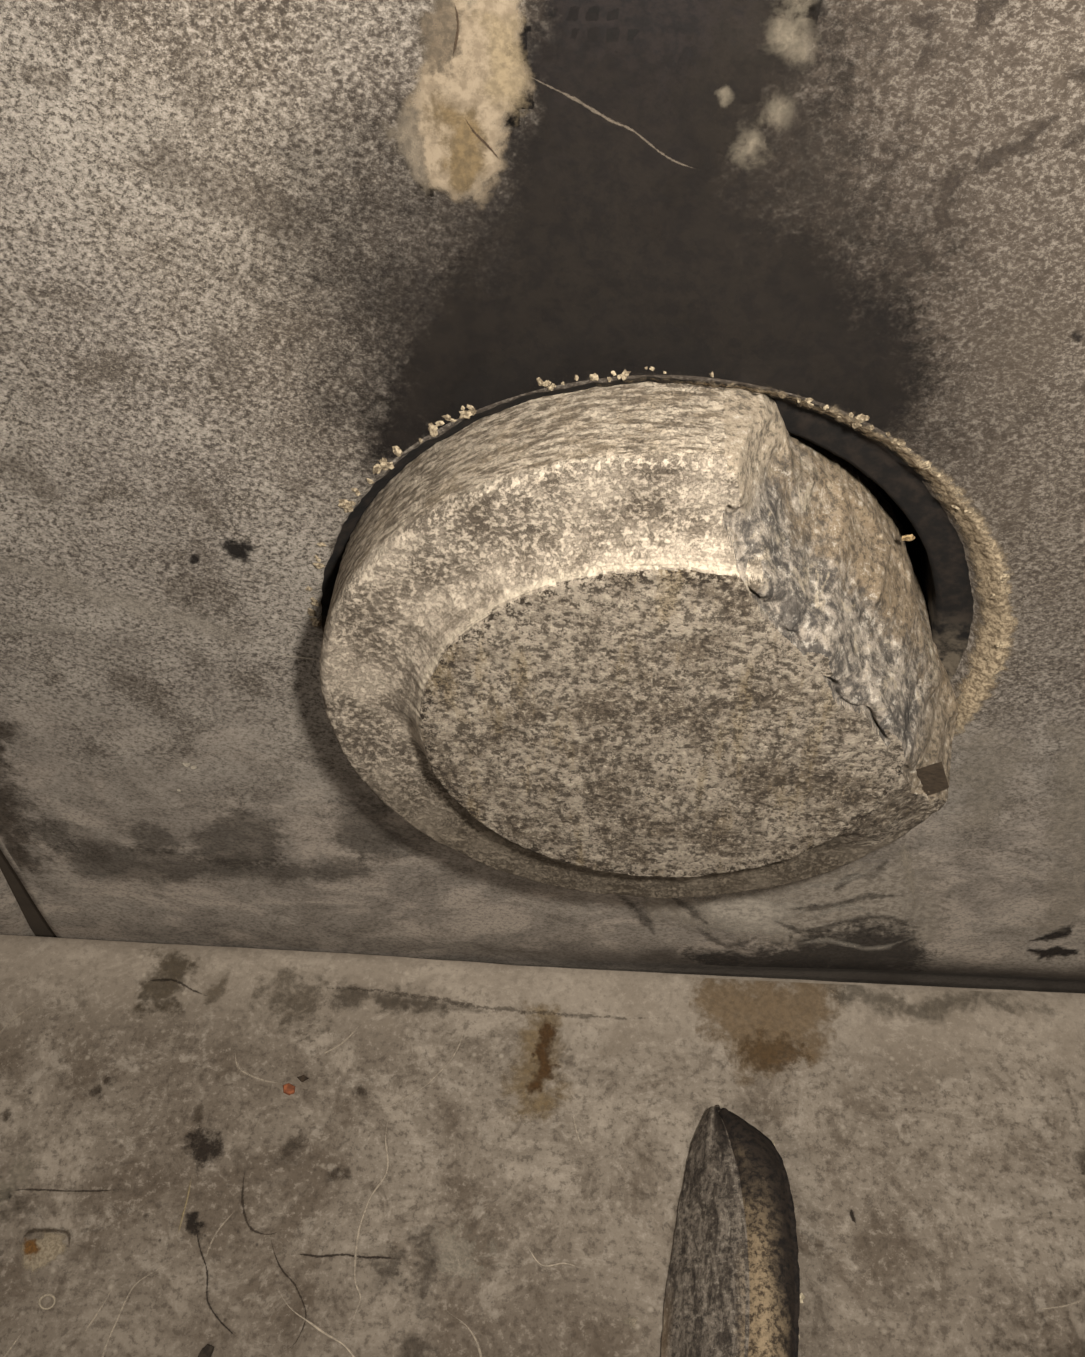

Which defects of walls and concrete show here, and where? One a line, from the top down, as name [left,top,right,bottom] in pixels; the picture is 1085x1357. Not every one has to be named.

damp [913,13,935,66]
peeling [387,0,534,201]
damp [976,117,1054,172]
damp [330,0,918,457]
damp [935,167,961,232]
damp [684,922,925,971]
rust [514,1006,566,1117]
rust [695,979,828,1078]